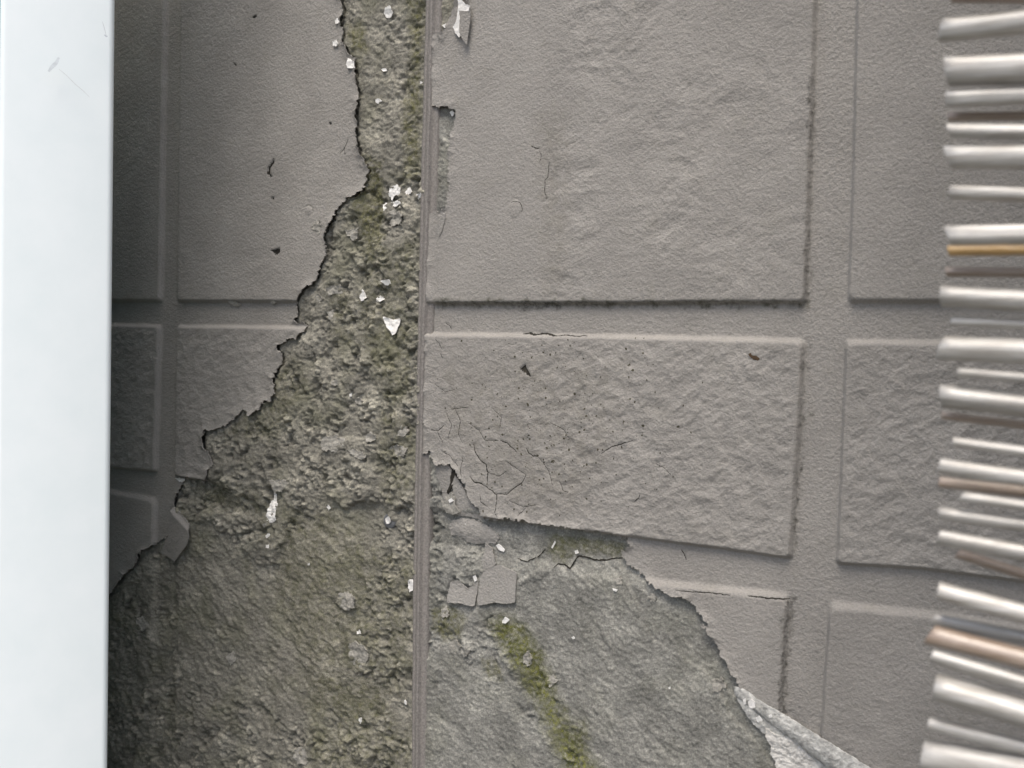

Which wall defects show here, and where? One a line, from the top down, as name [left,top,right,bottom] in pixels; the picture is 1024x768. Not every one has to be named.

peeling [107,0,426,768]
crack [432,385,568,515]
crack [517,550,621,569]
peeling [425,451,870,768]